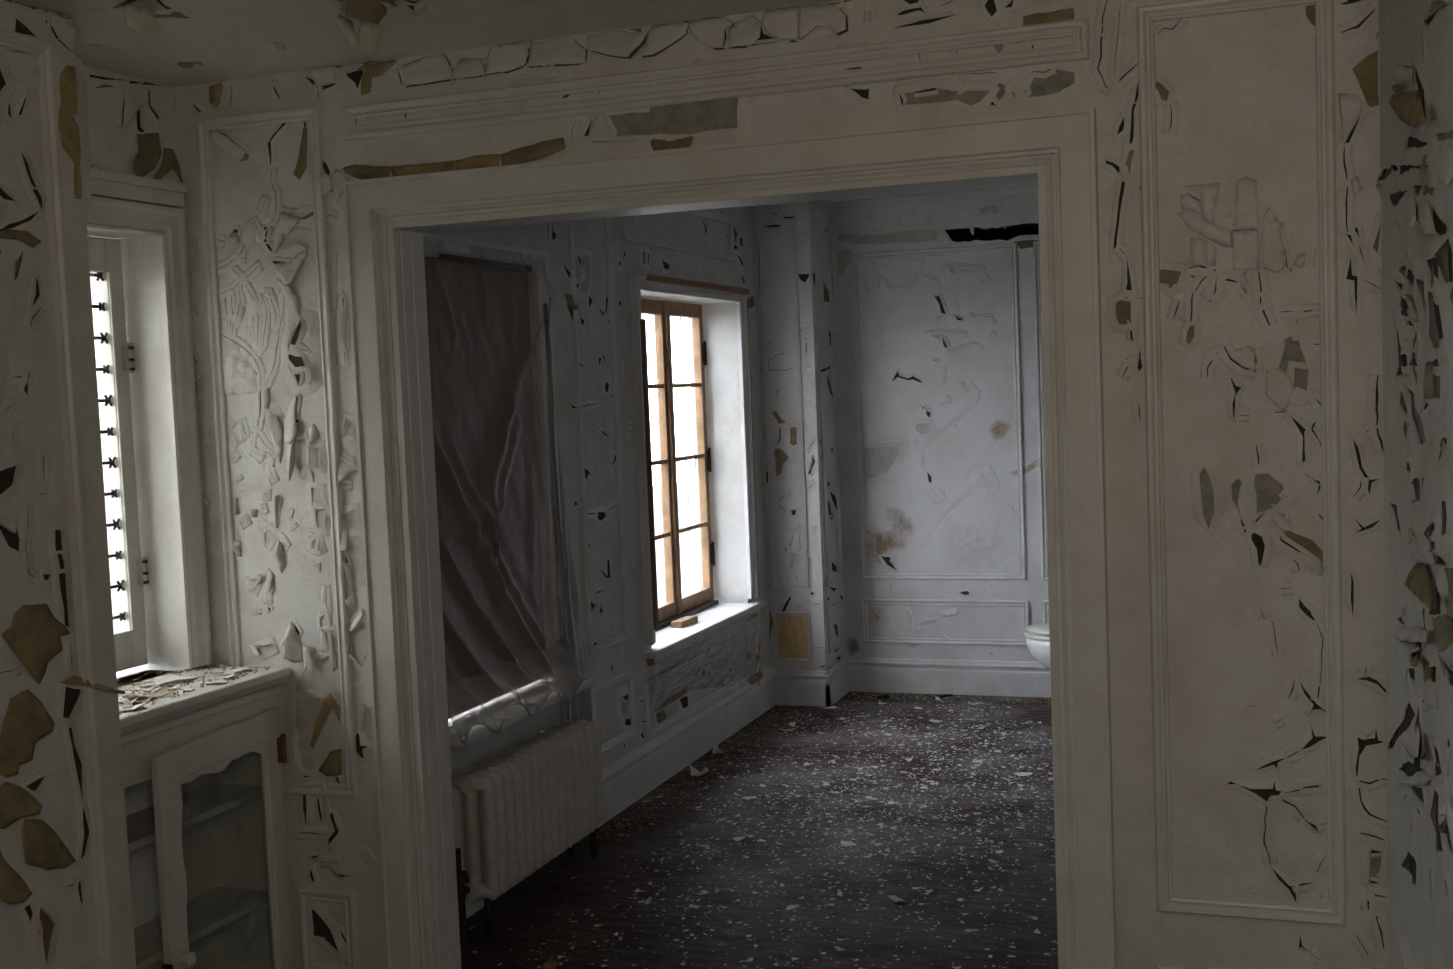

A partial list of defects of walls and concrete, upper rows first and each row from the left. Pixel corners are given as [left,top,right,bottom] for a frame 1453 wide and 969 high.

peeling [0,8,102,280]
peeling [0,82,751,969]
peeling [609,267,845,752]
peeling [878,553,901,590]
peeling [957,588,972,598]
peeling [1335,0,1453,912]
peeling [1227,722,1328,906]